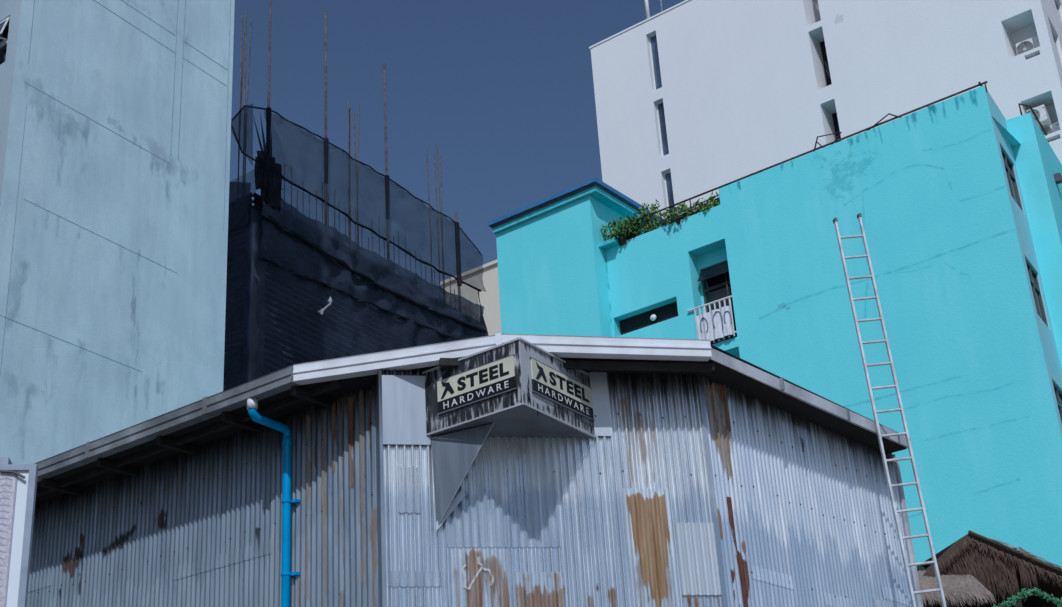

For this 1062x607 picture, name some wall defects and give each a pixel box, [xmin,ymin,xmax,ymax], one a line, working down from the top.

rust [702,379,733,478]
rust [621,397,670,607]
rust [62,533,84,577]
rust [458,548,566,607]
rust [717,497,750,607]